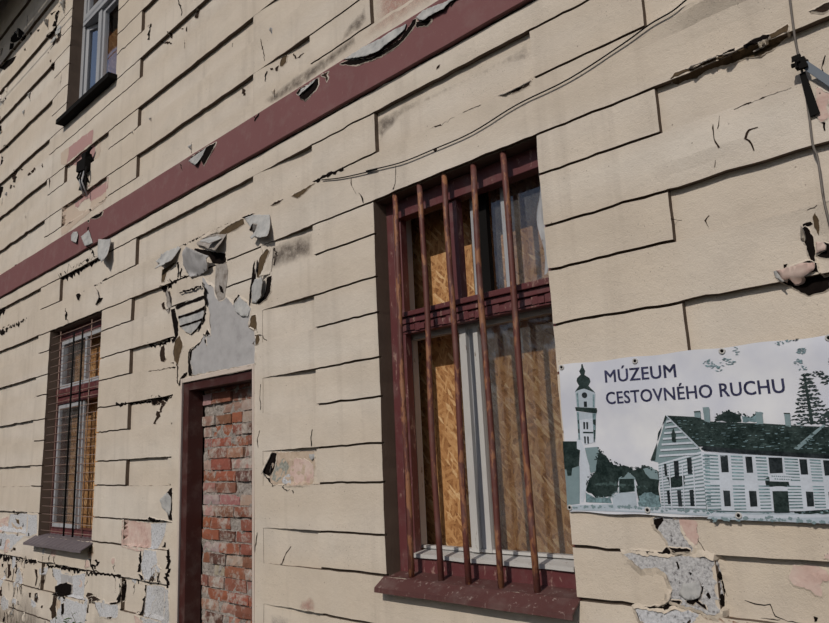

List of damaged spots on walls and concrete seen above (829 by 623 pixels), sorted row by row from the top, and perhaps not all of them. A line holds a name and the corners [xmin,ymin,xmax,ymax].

crack [712,92,777,167]
peeling [814,87,829,131]
peeling [148,167,344,386]
peeling [774,259,829,297]
peeling [261,449,317,493]
peeling [0,487,173,623]
spalling [620,515,730,623]
peeling [788,552,829,598]
crack [745,600,797,623]